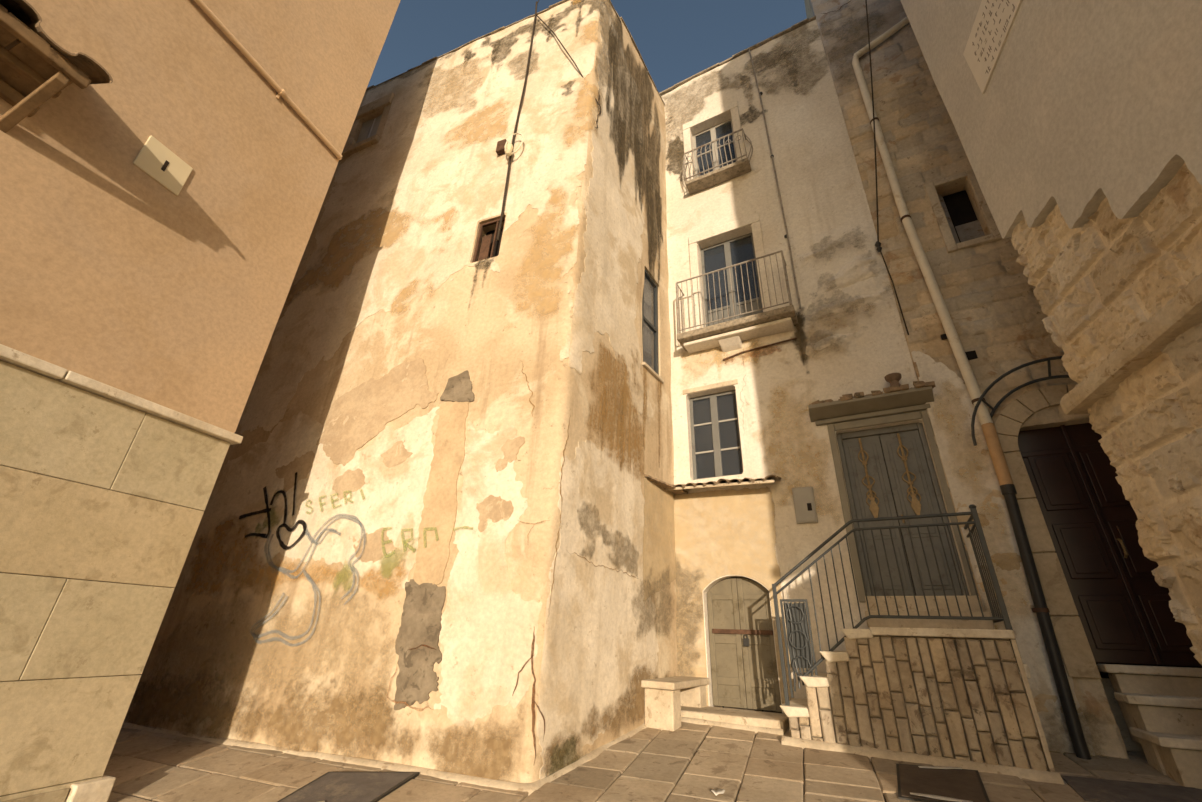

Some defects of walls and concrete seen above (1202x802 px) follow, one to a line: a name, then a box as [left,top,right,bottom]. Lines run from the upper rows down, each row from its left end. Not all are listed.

leakage [566,0,884,285]
peeling [181,0,653,599]
leakage [588,344,662,477]
leakage [791,308,852,373]
leakage [186,517,336,593]
crack [512,409,636,763]
leakage [580,505,636,572]
leakage [127,597,417,757]
leakage [430,728,518,781]
leakage [546,564,702,772]